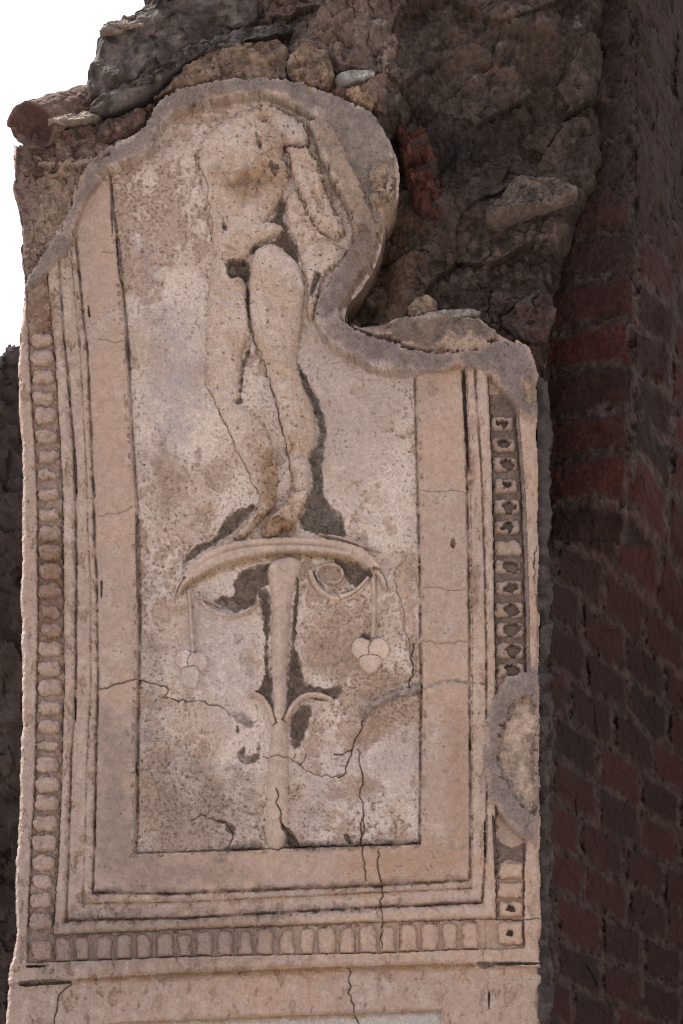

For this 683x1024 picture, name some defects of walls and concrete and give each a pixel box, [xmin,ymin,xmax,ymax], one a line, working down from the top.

spalling [268,160,280,178]
flaking render [13,146,95,282]
spalling [111,196,123,285]
spalling [224,197,299,332]
spalling [309,270,322,297]
flaking render [351,312,498,354]
crack [100,679,230,716]
crack [264,556,495,949]
flaking render [496,692,540,818]
crack [348,968,359,1024]